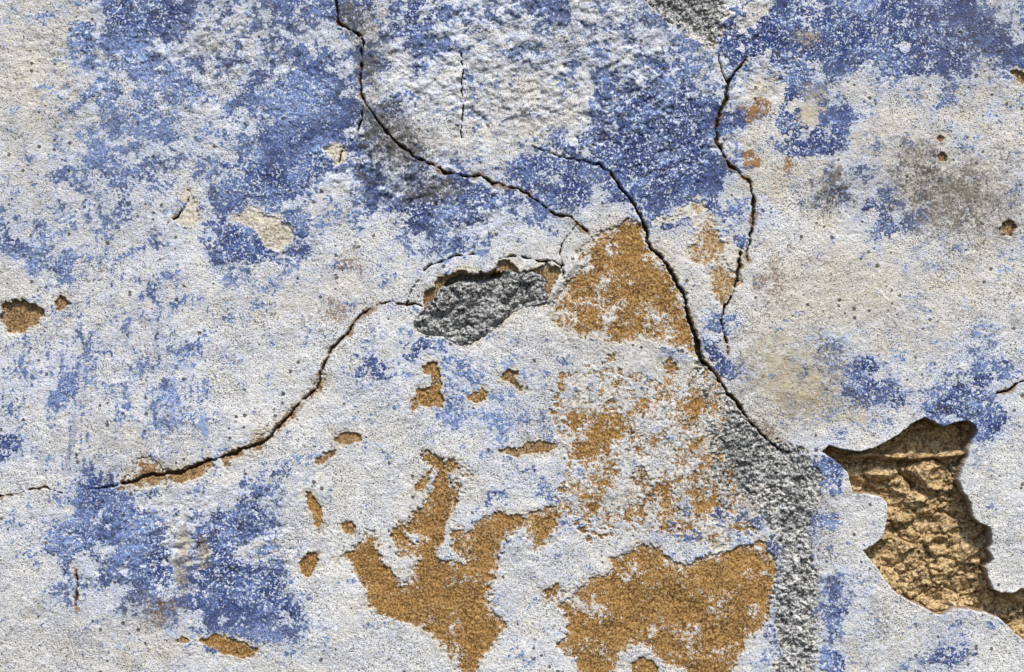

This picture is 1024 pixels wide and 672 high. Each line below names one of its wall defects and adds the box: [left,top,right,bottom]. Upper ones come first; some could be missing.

peeling [330,0,376,15]
flaking render [1,296,71,333]
peeling [207,144,347,265]
crack [96,253,474,489]
crack [335,0,588,276]
crack [534,56,790,453]
peeling [340,0,1024,672]
flaking render [177,633,258,659]